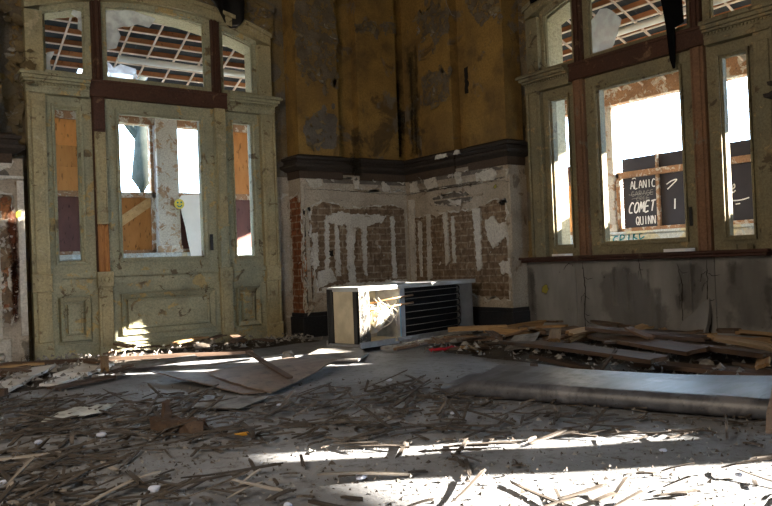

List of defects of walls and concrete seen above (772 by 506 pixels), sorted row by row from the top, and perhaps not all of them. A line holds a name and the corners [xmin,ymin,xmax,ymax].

spalling [0,160,14,180]
spalling [0,191,19,327]
flaking render [278,166,512,318]